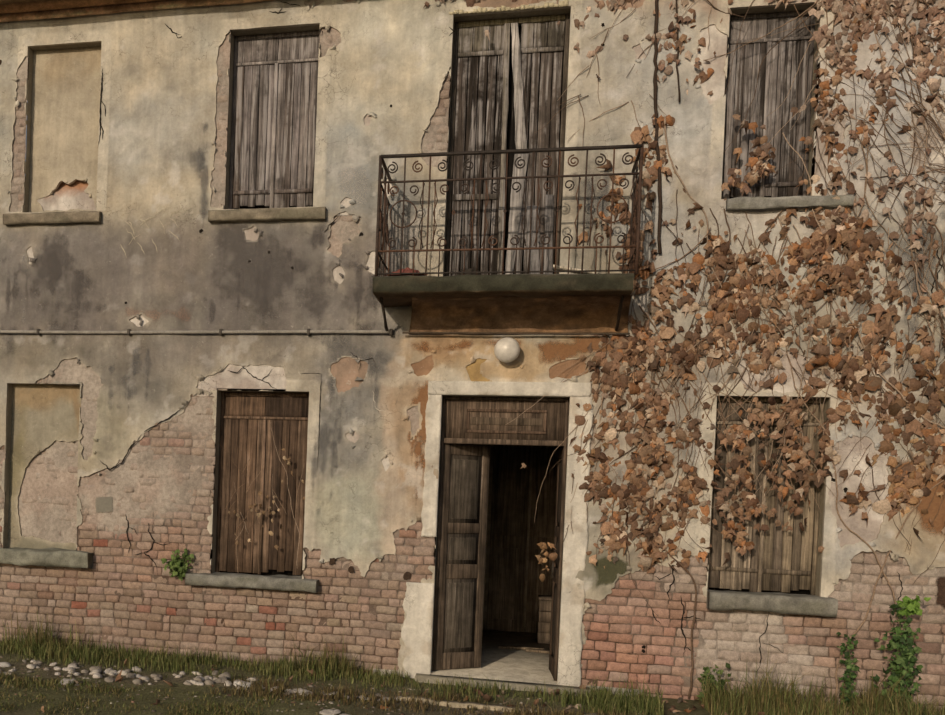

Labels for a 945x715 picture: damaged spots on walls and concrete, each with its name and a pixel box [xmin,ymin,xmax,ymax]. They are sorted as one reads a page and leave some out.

spalling [7,57,28,212]
crack [98,69,106,145]
spalling [209,30,234,209]
spalling [418,73,451,168]
spalling [37,178,96,211]
leakage [32,240,99,309]
leakage [218,224,305,315]
spalling [328,197,365,284]
crack [227,366,276,389]
crack [126,517,169,567]
spalling [0,357,435,673]
spalling [581,434,945,712]